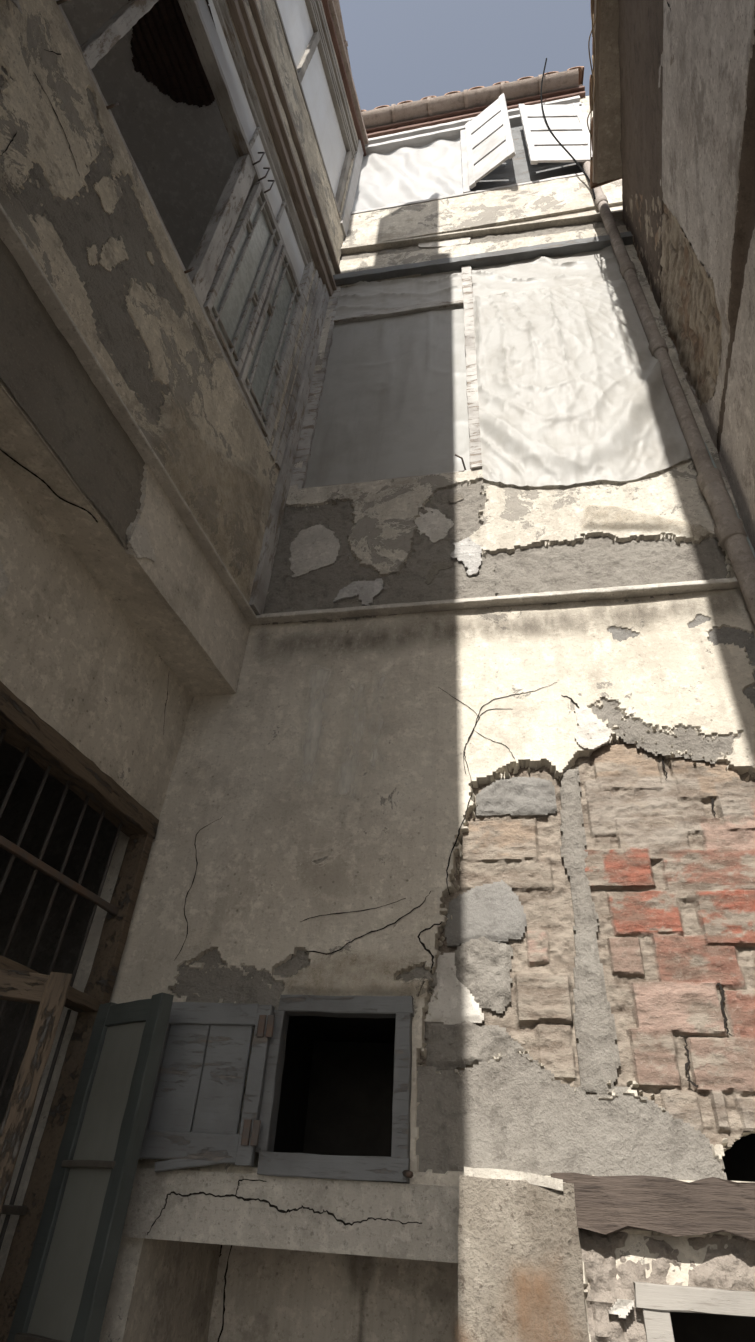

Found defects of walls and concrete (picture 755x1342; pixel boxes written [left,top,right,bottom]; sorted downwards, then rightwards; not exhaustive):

spalling [130,0,215,108]
peeling [13,88,206,425]
spalling [0,238,156,562]
crack [0,449,98,523]
spalling [262,480,732,625]
peeling [688,615,755,708]
crack [291,682,580,997]
peeling [170,949,310,1010]
spalling [396,699,755,1182]
crack [147,1179,422,1235]
crack [217,1245,232,1342]
peeling [608,1299,634,1318]